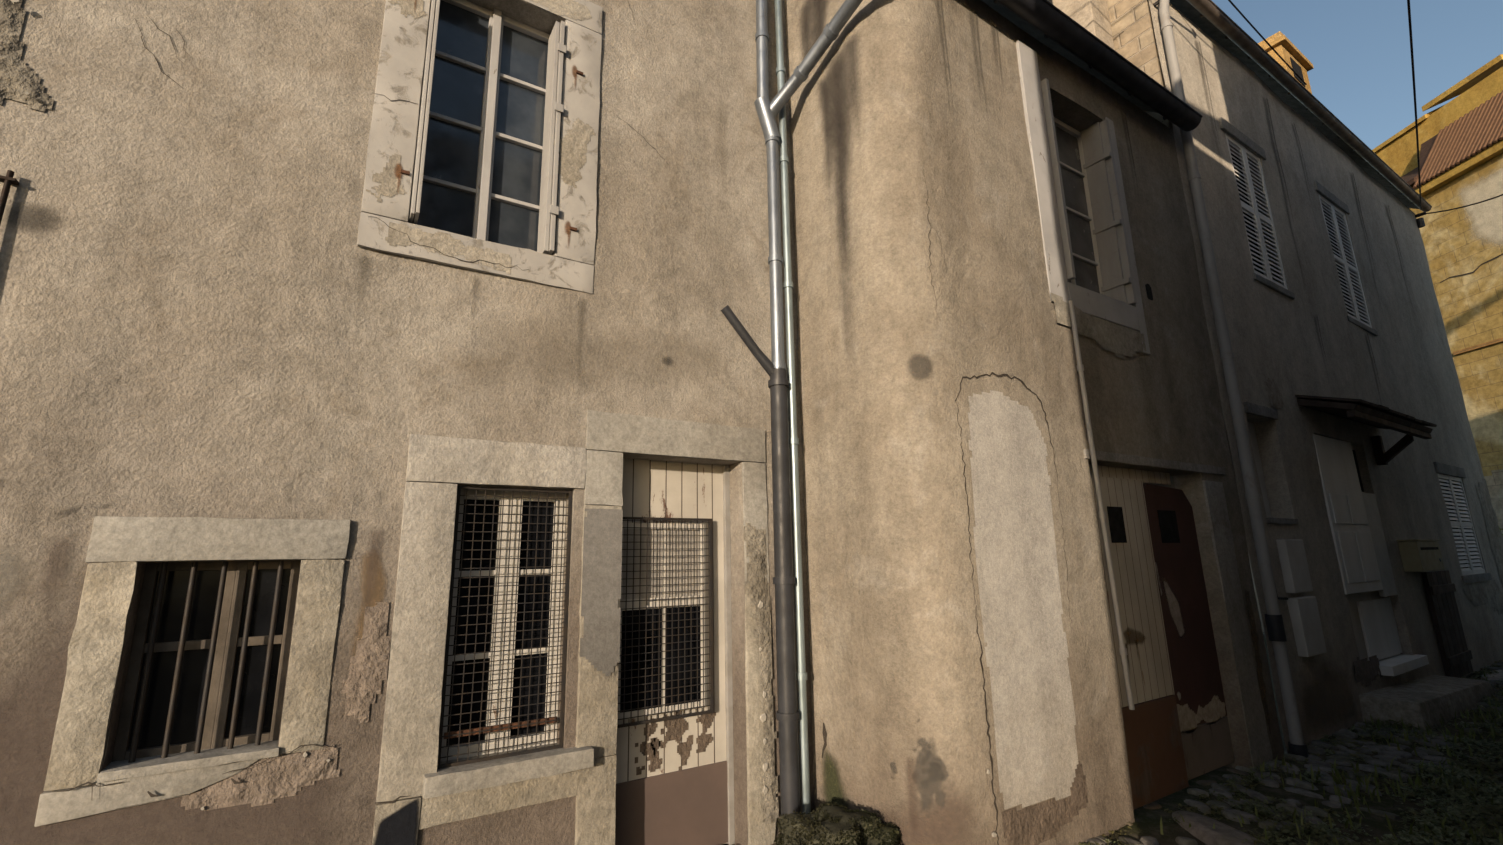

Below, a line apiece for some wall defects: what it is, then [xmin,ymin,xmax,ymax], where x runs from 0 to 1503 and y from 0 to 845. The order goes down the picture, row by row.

corrosion [395,164,410,186]
flaking render [341,552,391,724]
peeling [635,711,716,775]
peeling [1173,692,1226,733]
flaking render [181,744,340,811]